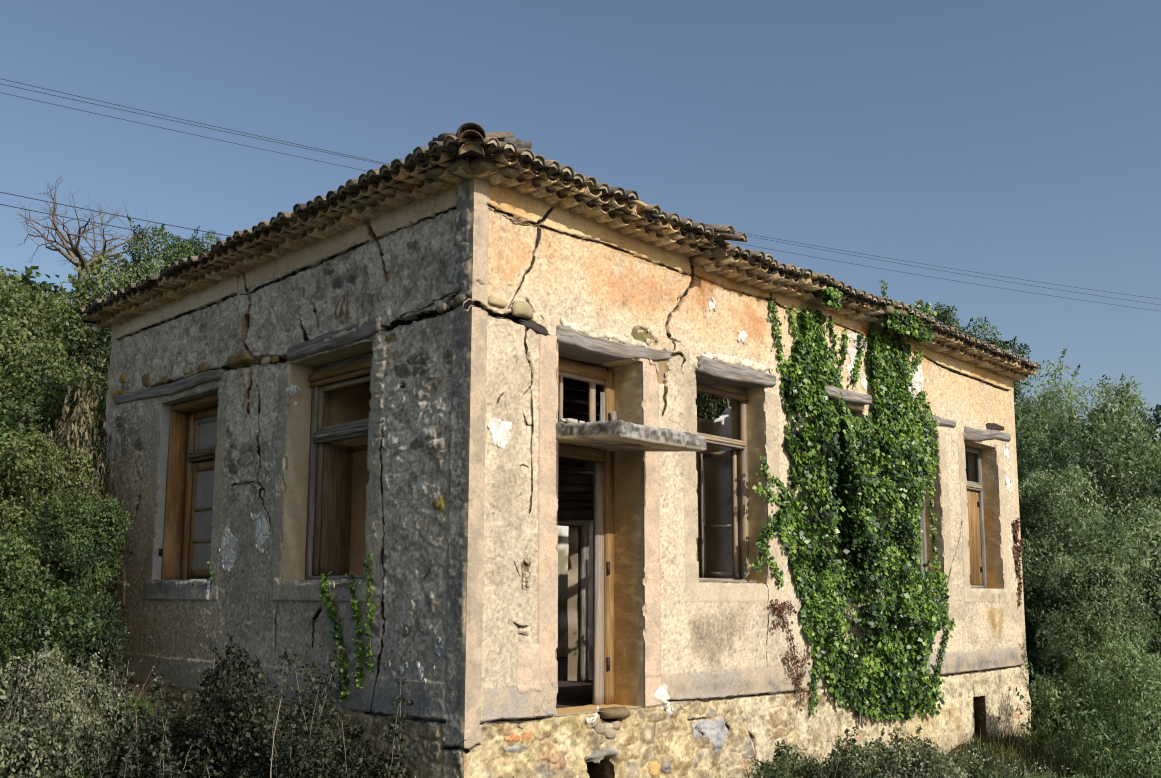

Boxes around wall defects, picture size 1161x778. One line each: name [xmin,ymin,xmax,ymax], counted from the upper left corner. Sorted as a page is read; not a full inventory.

crack [117,206,457,528]
crack [381,204,869,514]
flaking render [218,521,238,574]
flaking render [249,512,271,554]